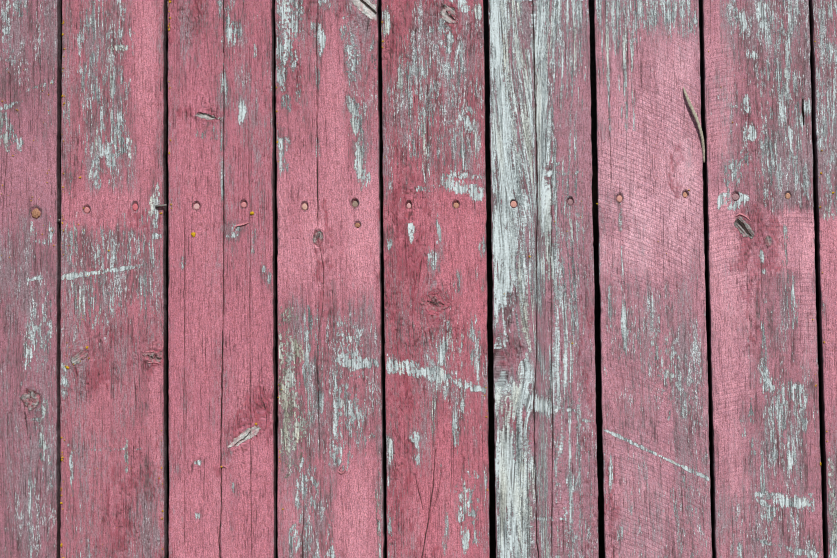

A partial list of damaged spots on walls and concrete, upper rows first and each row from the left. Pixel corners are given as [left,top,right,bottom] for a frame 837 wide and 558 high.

peeling [63,0,133,189]
crack [198,107,251,558]
peeling [279,305,379,558]
peeling [410,431,420,465]
crack [415,431,442,556]
peeling [428,215,441,270]
peeling [396,18,479,182]
peeling [426,316,481,454]
peeling [442,0,700,558]
peeling [717,151,750,211]
peeling [727,0,747,34]
peeling [743,0,837,198]